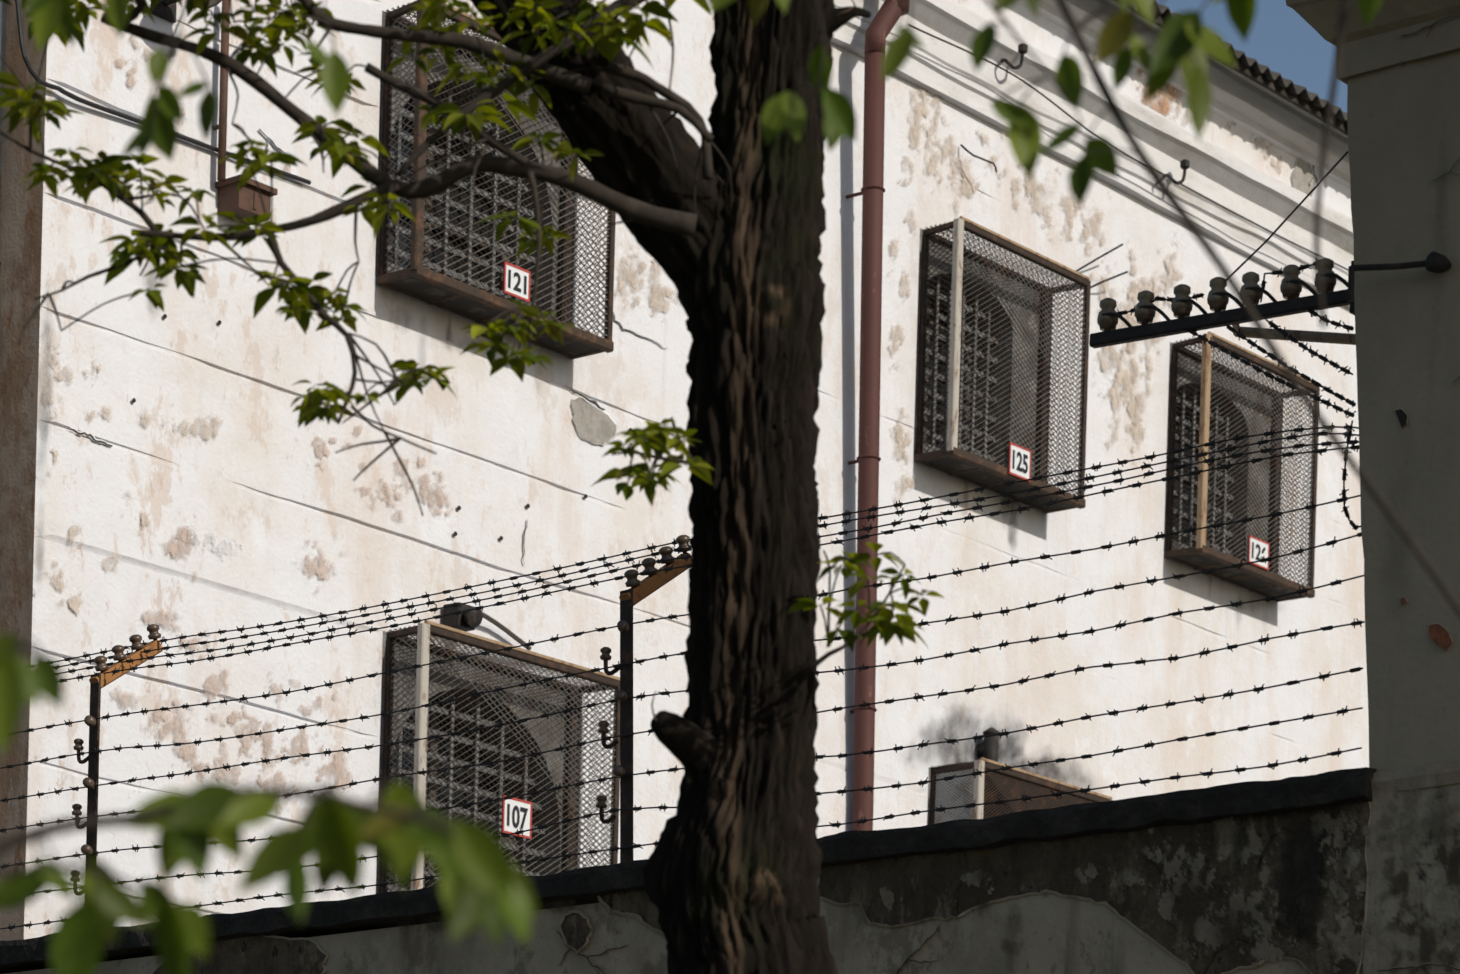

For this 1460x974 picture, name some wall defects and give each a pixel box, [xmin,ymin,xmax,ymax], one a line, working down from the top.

peeling [899,88,981,211]
peeling [977,130,1104,254]
peeling [313,425,362,465]
peeling [894,407,916,503]
peeling [360,456,450,521]
peeling [167,526,192,558]
peeling [303,541,333,579]
peeling [52,562,82,614]
spalling [1427,623,1454,651]
spalling [817,788,1460,974]
crack [556,931,626,974]